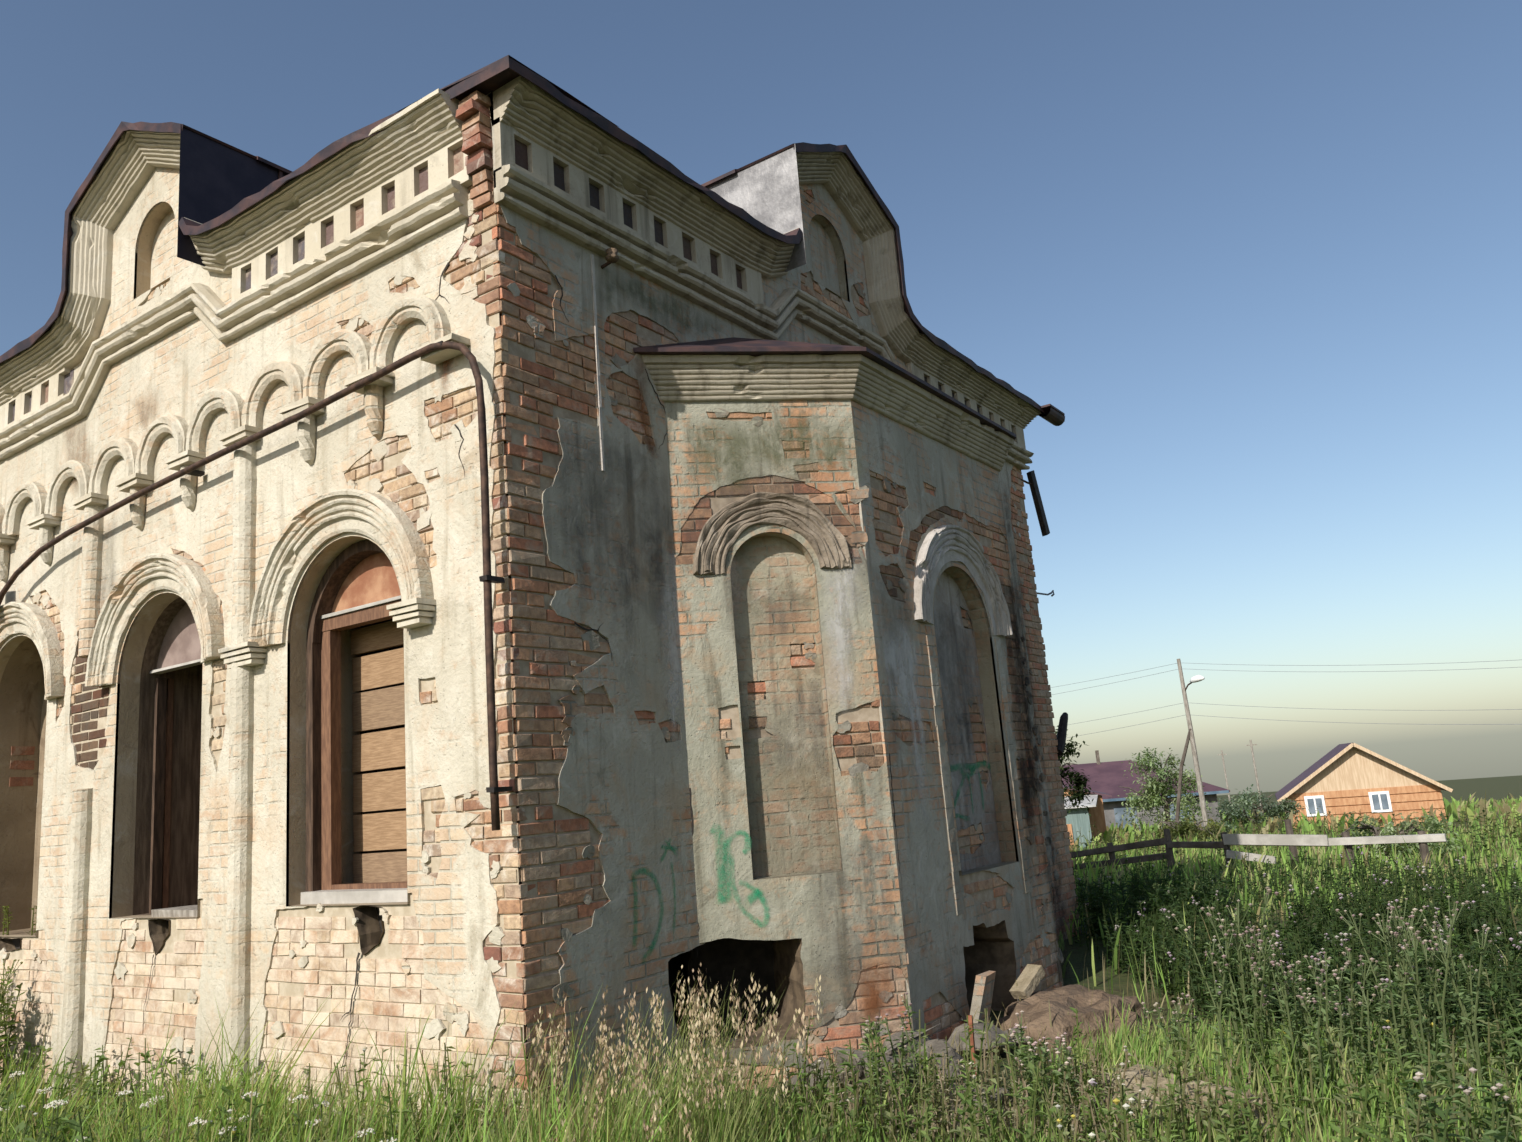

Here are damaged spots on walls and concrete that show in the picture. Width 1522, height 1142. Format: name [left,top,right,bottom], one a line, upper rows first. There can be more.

flaking render [259,149,680,1142]
flaking render [676,441,964,603]
spalling [668,466,1081,1094]
leakage [1003,558,1068,975]